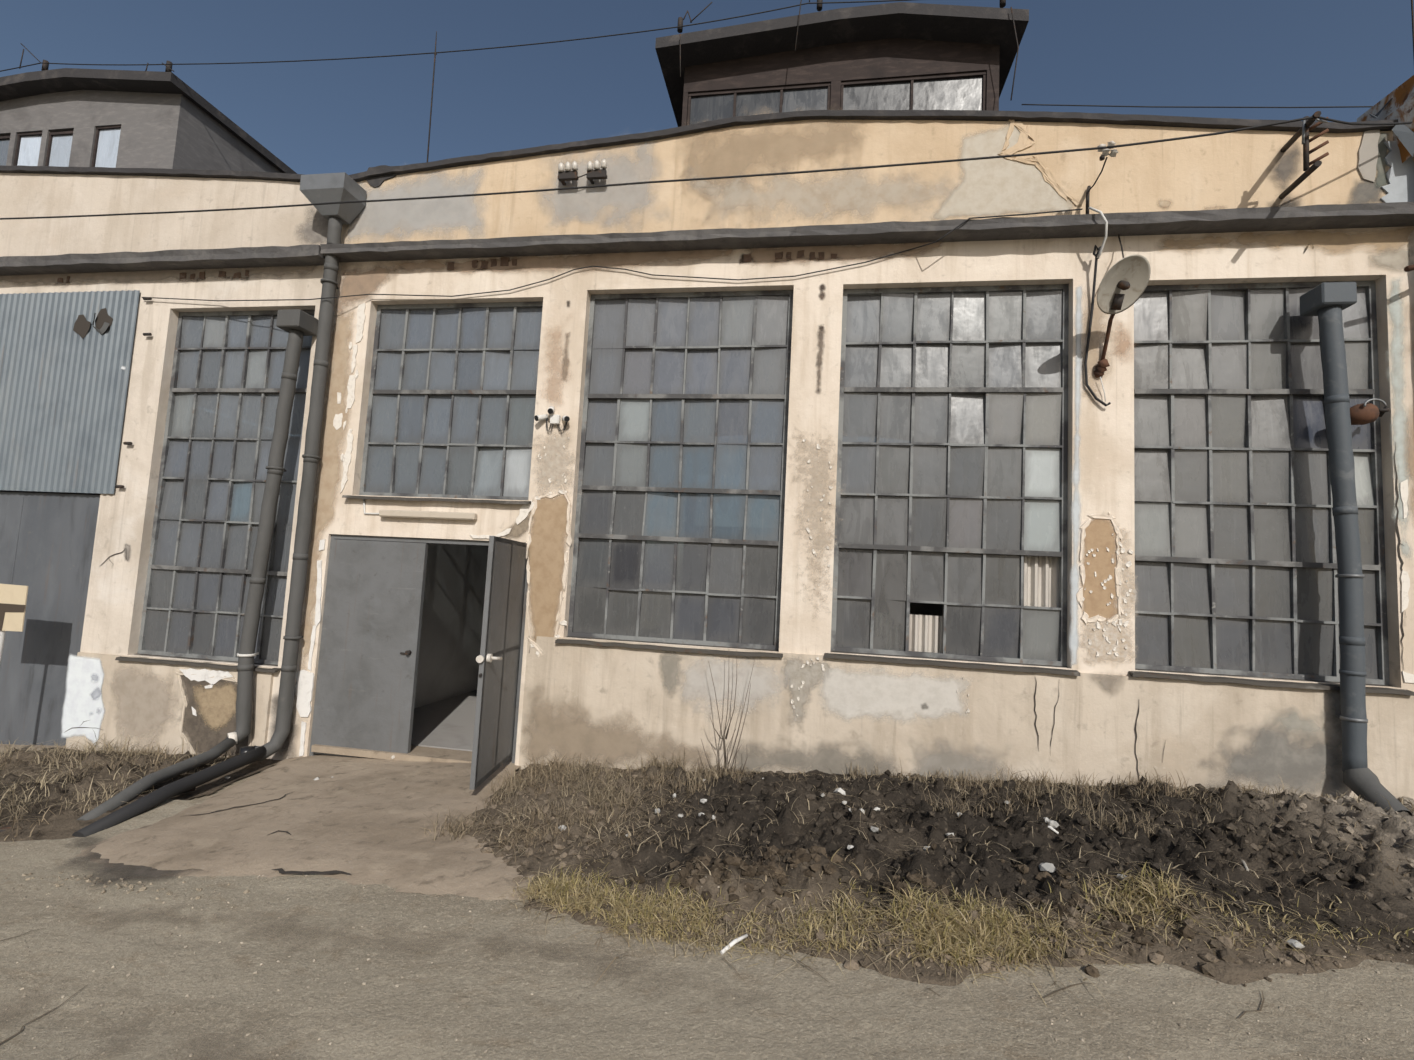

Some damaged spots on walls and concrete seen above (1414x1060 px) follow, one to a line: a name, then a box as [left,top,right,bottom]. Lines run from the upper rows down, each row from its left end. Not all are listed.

leakage [688,120,954,216]
flaking render [933,120,1082,219]
peeling [294,303,366,756]
flaking render [471,485,572,658]
flaking render [1076,512,1136,663]
spalling [175,668,254,758]
crack [1034,678,1059,756]
crack [1135,708,1166,778]